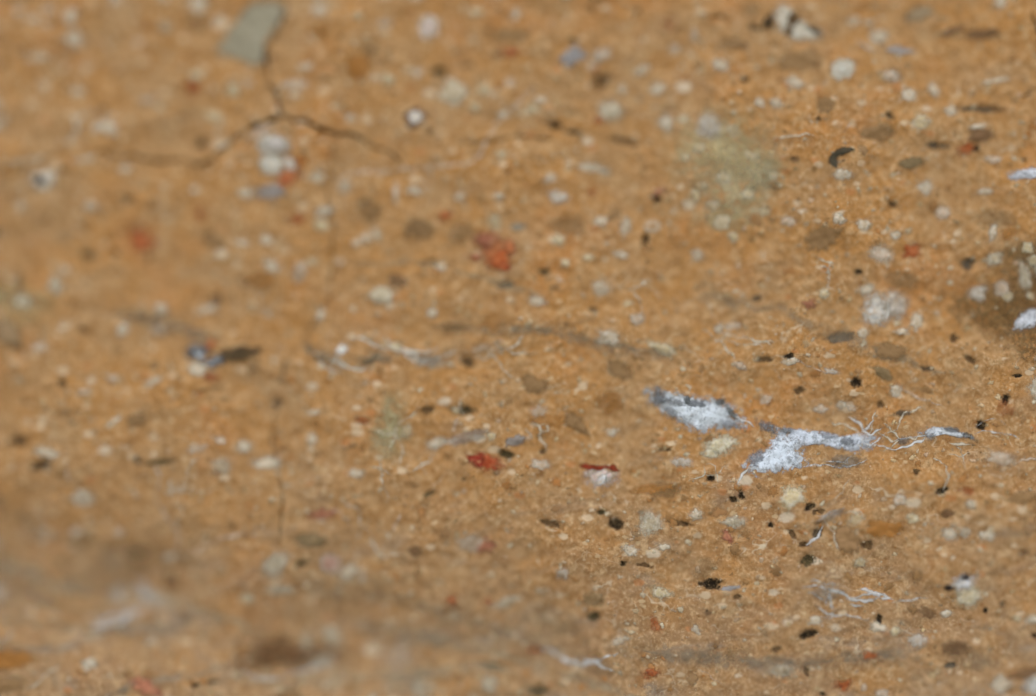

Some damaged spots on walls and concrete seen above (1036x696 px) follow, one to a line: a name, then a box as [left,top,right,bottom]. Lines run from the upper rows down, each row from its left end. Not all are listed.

crack [1,4,401,170]
leakage [644,387,1017,484]